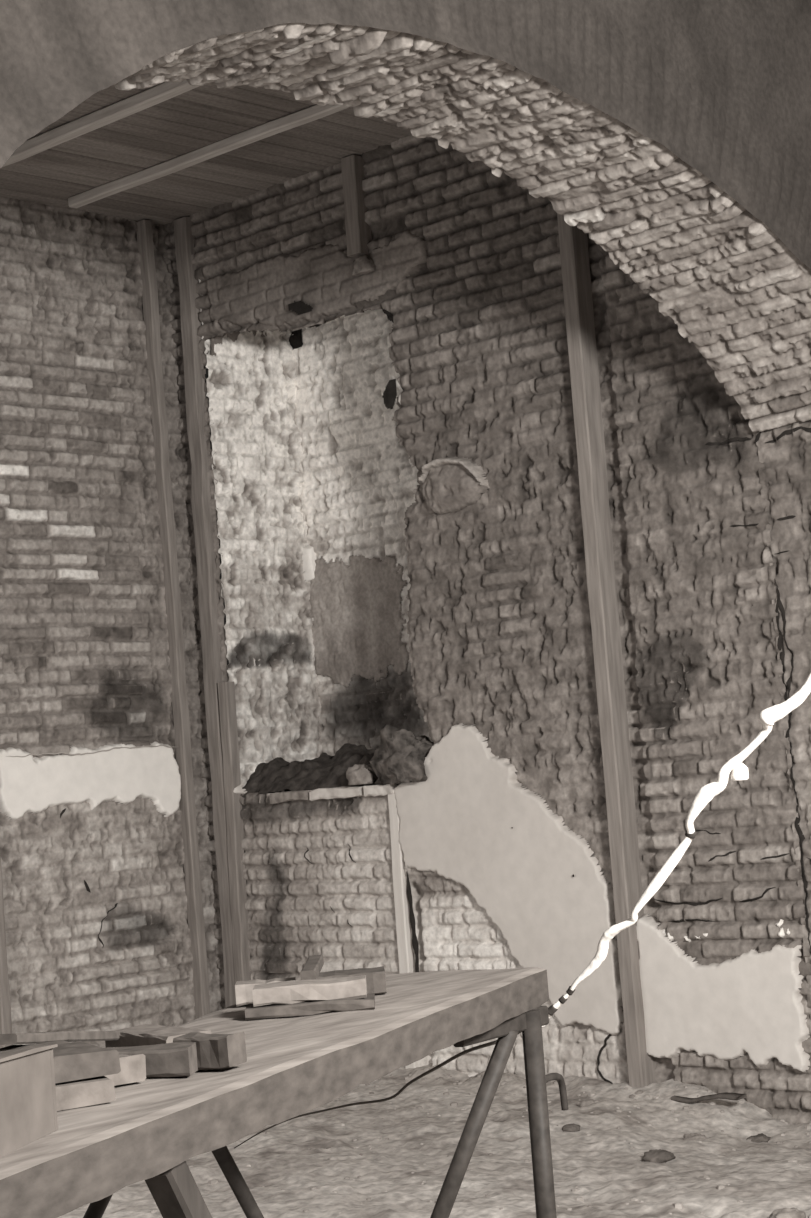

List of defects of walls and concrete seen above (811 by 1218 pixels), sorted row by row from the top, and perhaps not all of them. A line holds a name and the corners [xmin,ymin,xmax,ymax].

crack [705,426,811,446]
crack [731,515,796,527]
crack [654,551,811,950]